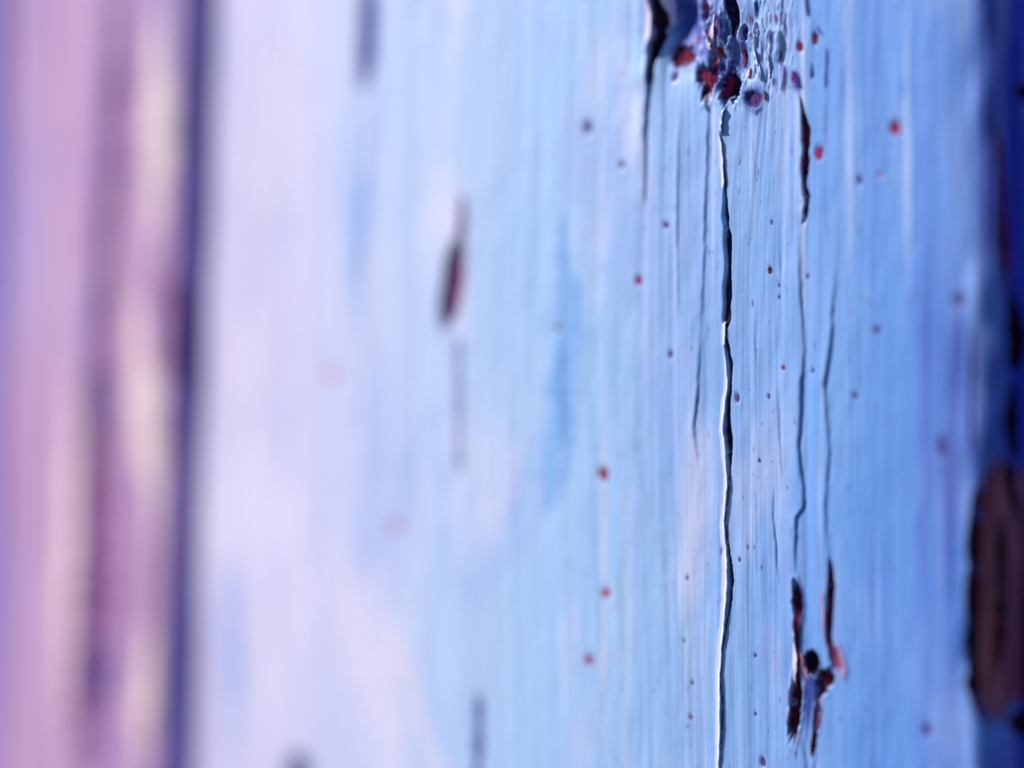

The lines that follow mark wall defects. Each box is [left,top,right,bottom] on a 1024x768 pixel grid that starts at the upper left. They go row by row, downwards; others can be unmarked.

crack [644,0,676,198]
peeling [706,13,732,61]
crack [725,0,740,38]
peeling [752,3,827,91]
crack [678,96,833,768]
spalling [786,561,846,762]